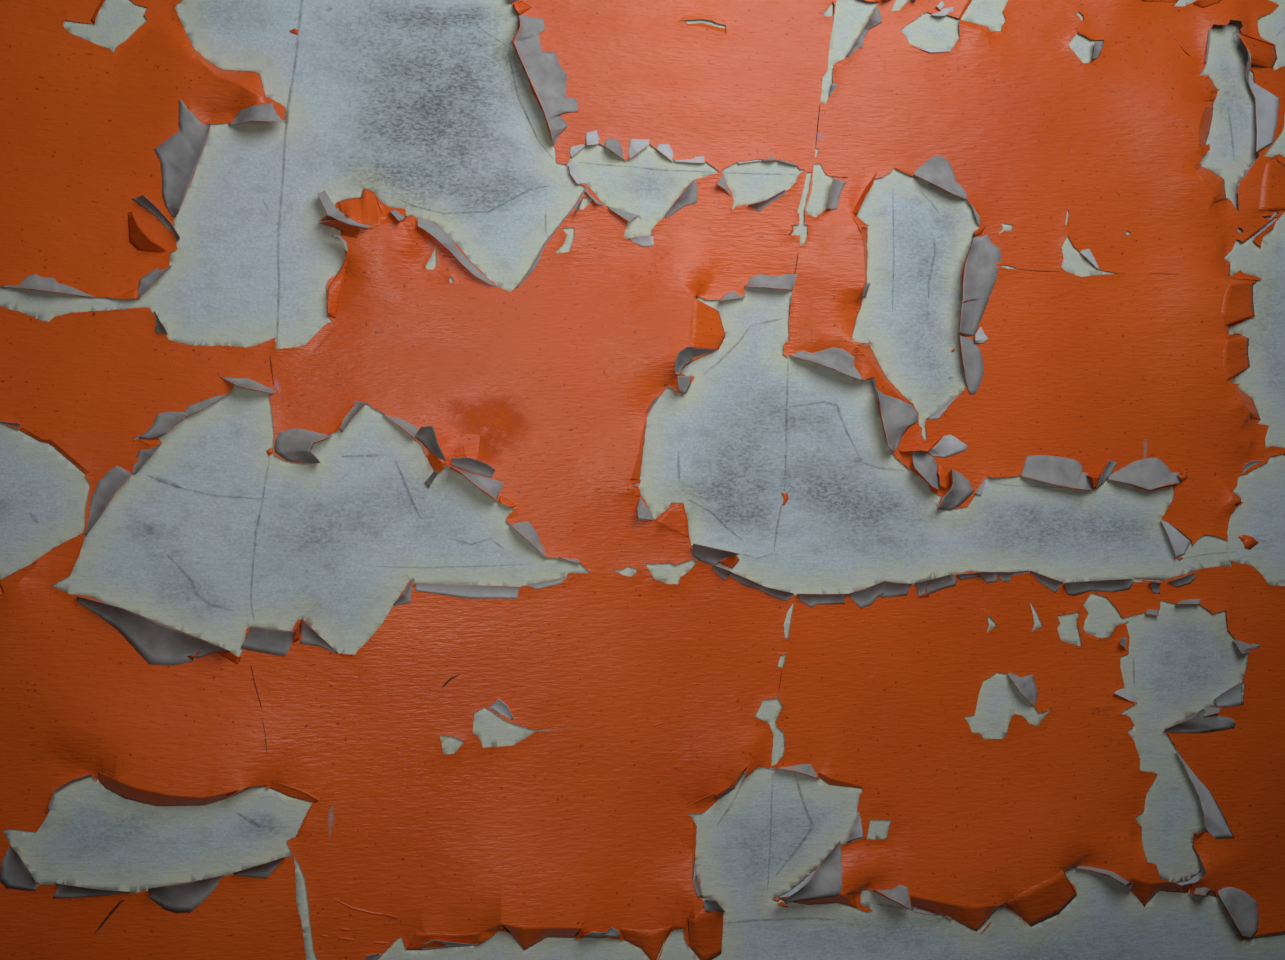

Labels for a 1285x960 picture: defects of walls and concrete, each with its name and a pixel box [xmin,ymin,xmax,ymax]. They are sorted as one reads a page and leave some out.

peeling [0,0,846,349]
peeling [0,376,590,665]
peeling [366,0,1285,960]
peeling [0,772,318,960]